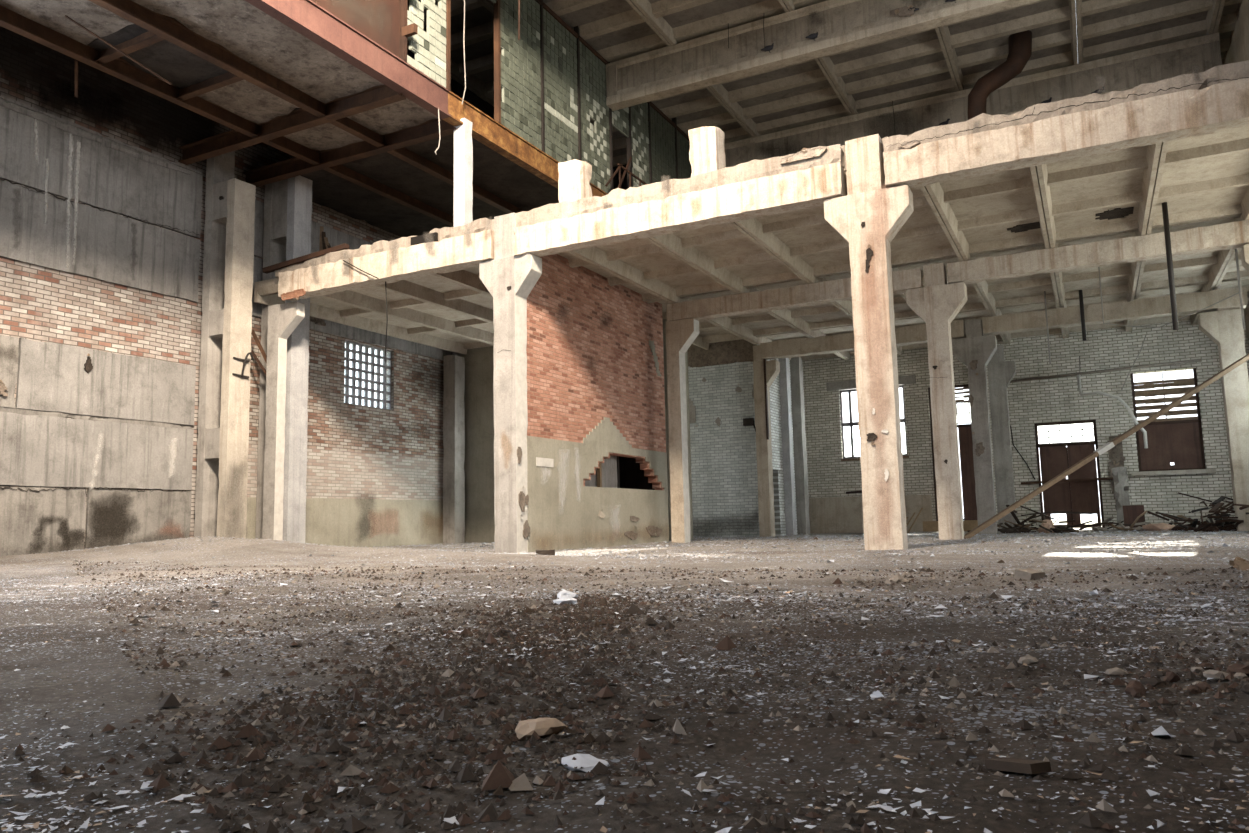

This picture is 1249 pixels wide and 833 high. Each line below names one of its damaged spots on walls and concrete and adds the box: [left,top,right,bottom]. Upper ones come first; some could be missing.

damp [33,494,176,551]